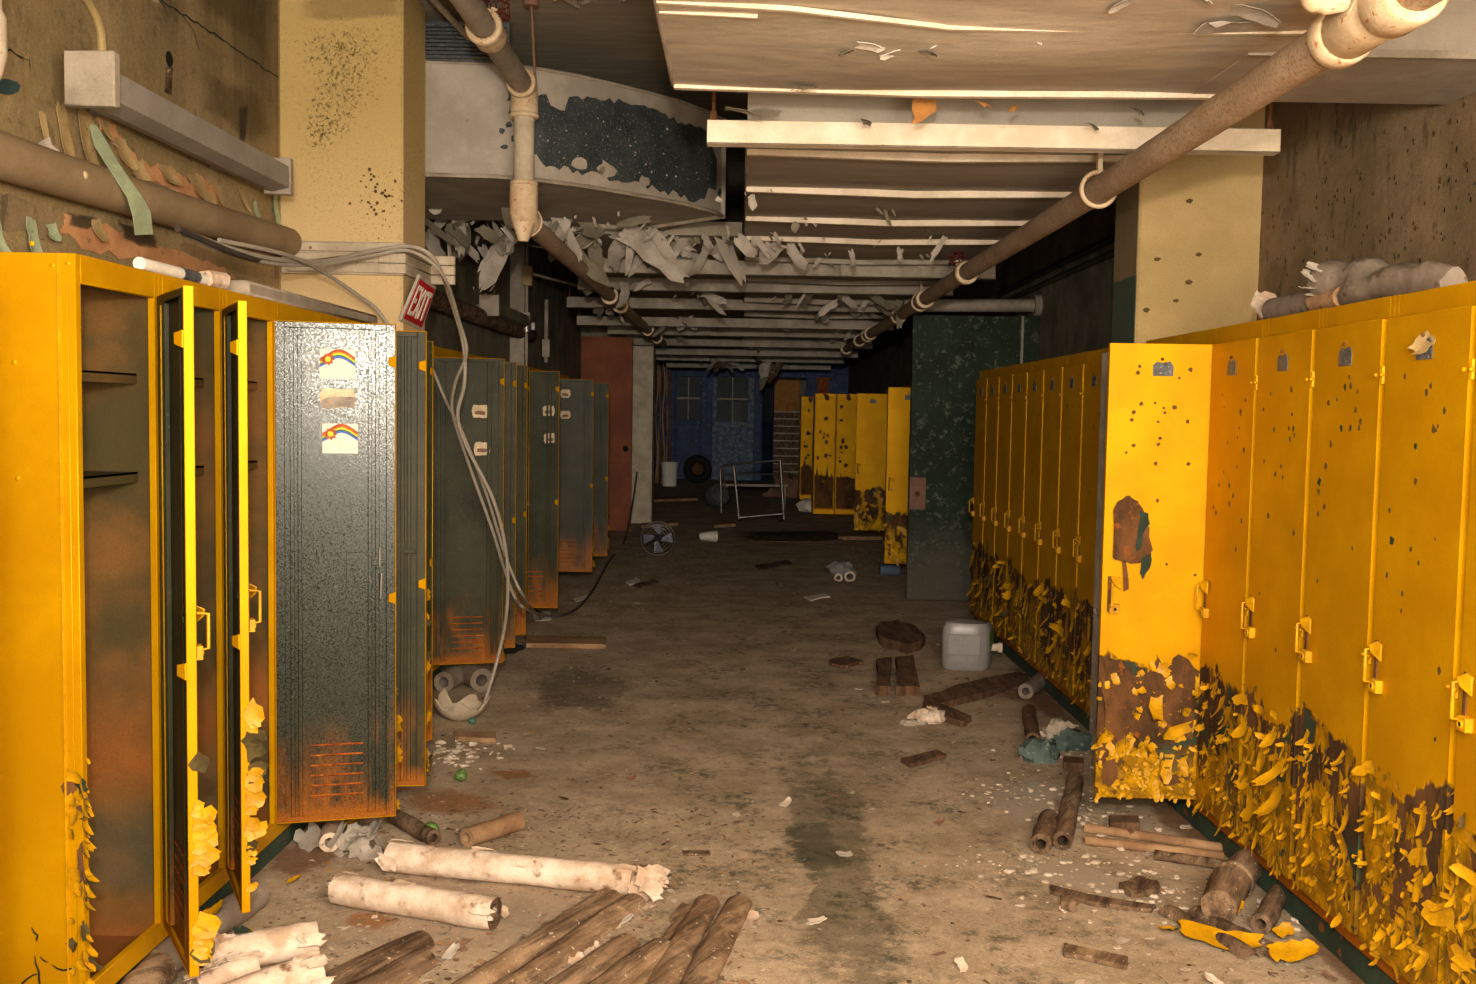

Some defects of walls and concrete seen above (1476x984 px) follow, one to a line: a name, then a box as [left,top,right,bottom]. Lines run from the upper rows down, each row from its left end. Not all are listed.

peeling [1192,0,1282,35]
water stain [300,18,378,159]
peeling [499,95,514,149]
peeling [534,94,723,203]
peeling [0,222,11,252]
peeling [26,101,281,279]
peeling [745,189,773,211]
peeling [864,202,948,267]
spalling [1262,162,1455,276]
peeling [425,207,857,344]
peeling [769,294,903,344]
peeling [700,329,791,391]